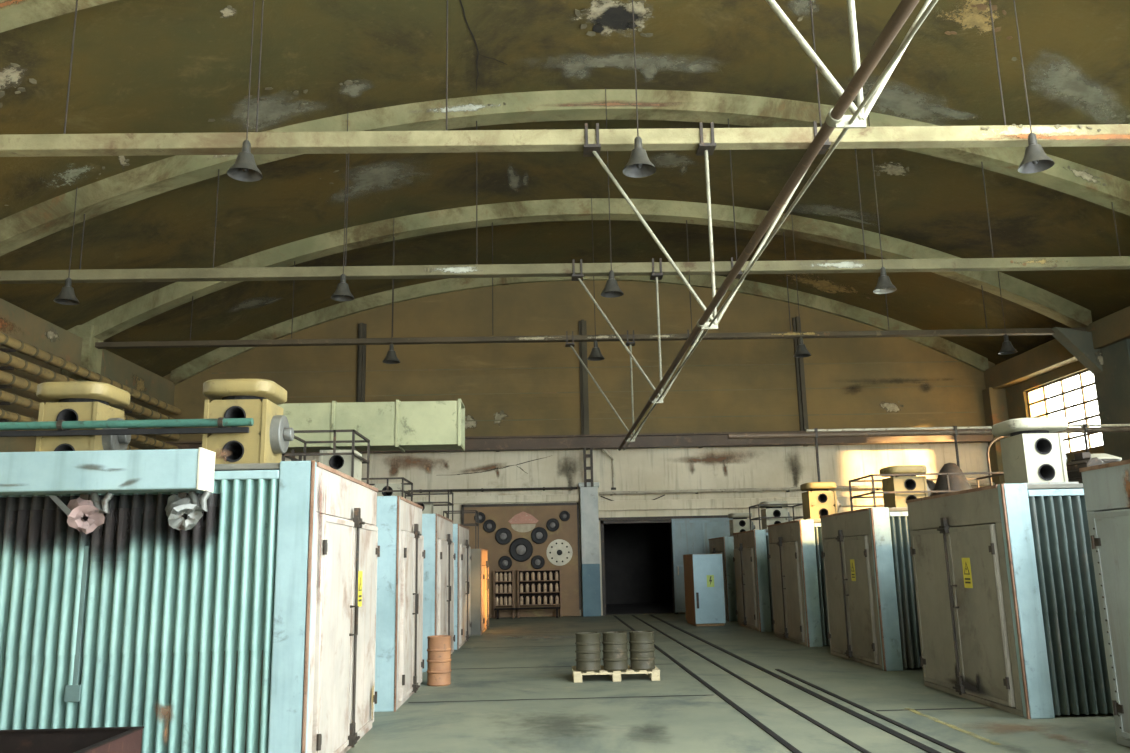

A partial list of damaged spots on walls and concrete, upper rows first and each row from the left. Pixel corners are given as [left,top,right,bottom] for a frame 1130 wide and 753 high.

spalling [573,0,653,37]
peeling [940,0,1013,40]
spalling [0,63,37,108]
efflorescence [1031,60,1130,124]